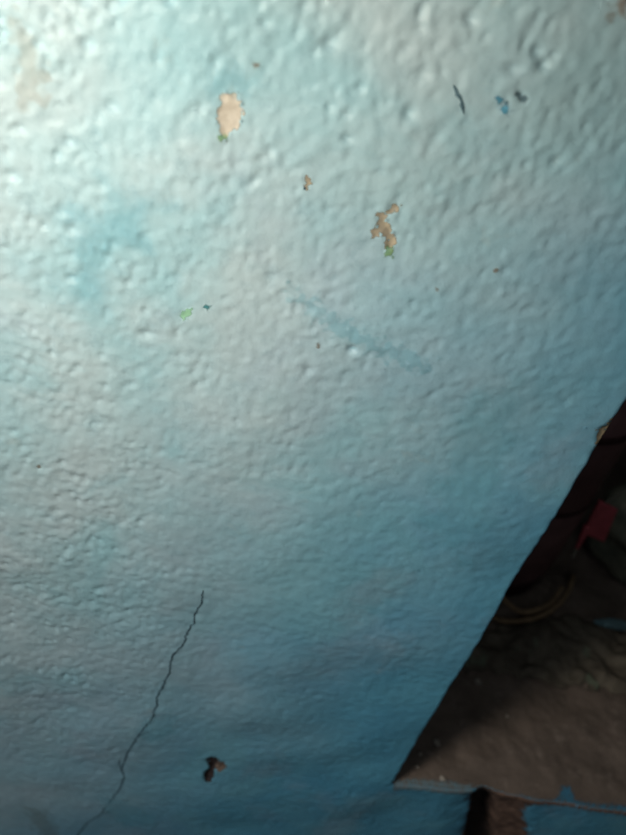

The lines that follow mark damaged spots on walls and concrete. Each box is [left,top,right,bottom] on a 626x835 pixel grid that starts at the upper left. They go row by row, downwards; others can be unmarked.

peeling [214,91,245,143]
peeling [370,204,402,256]
crack [77,590,204,835]
spalling [204,757,227,782]